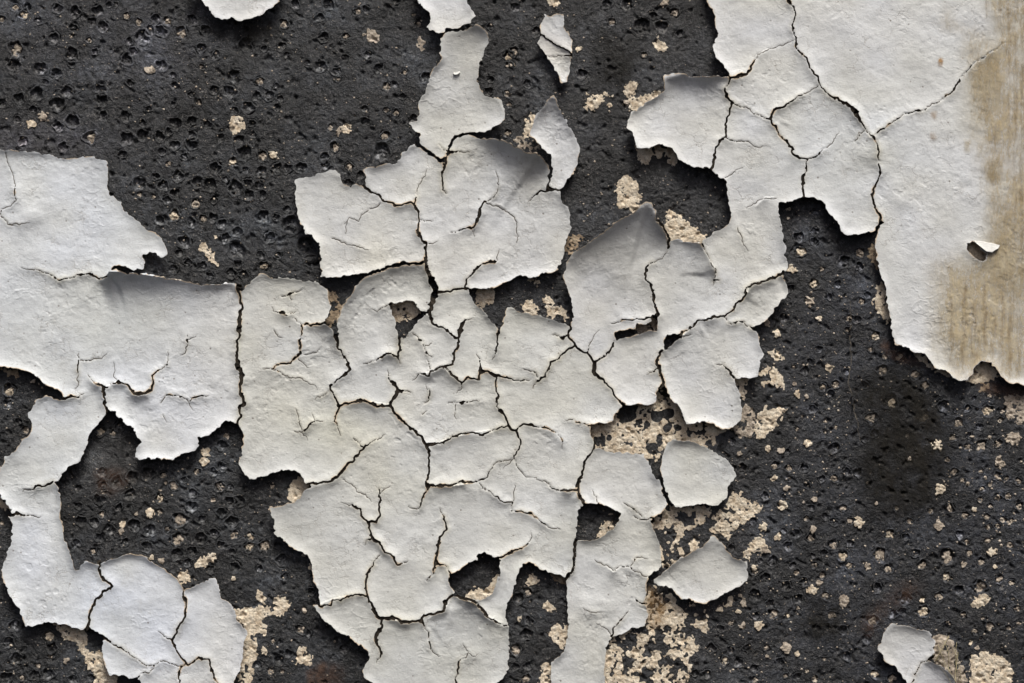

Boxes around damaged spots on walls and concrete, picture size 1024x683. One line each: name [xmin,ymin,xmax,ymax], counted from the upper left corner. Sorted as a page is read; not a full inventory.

peeling [202,0,280,21]
peeling [530,0,589,83]
flaking render [583,92,614,111]
damp [941,0,1024,374]
crack [646,270,785,389]
crack [62,335,206,422]
crack [235,149,671,683]
crack [12,481,53,518]
peeling [861,455,1024,683]
crack [84,560,217,683]
flaking render [295,646,313,667]
flaking render [690,609,709,634]